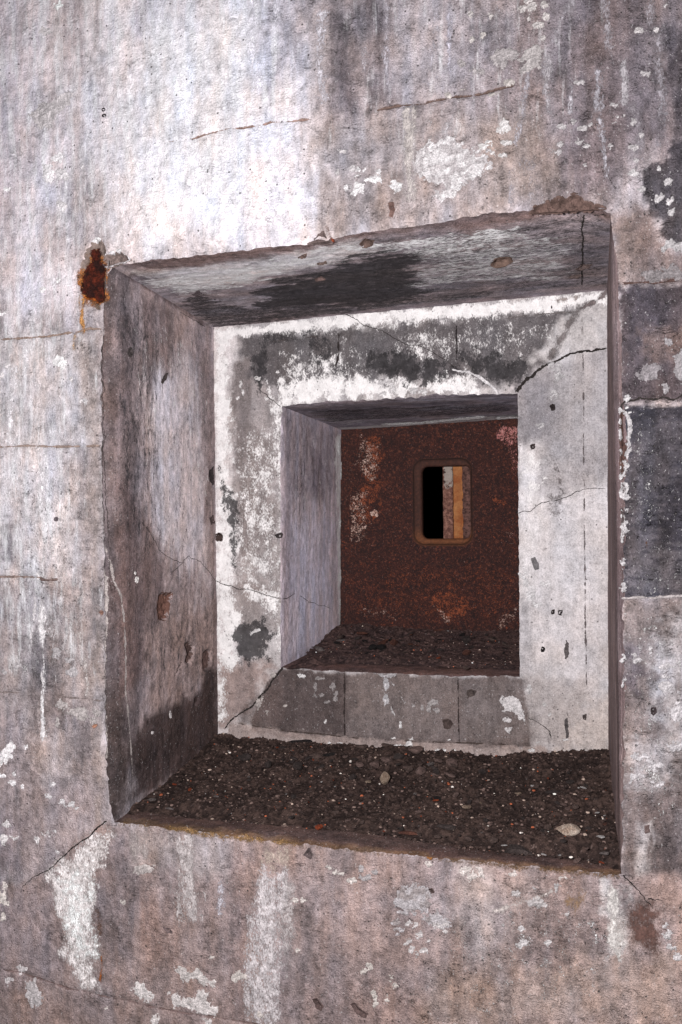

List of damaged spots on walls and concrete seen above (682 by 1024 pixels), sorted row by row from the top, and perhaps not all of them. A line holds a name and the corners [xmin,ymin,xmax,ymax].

crack [581,214,604,285]
corrosion [73,248,110,349]
damp [547,290,607,360]
damp [452,369,498,395]
crack [516,348,607,392]
crack [141,521,324,606]
crack [225,667,283,728]
crack [21,821,107,891]